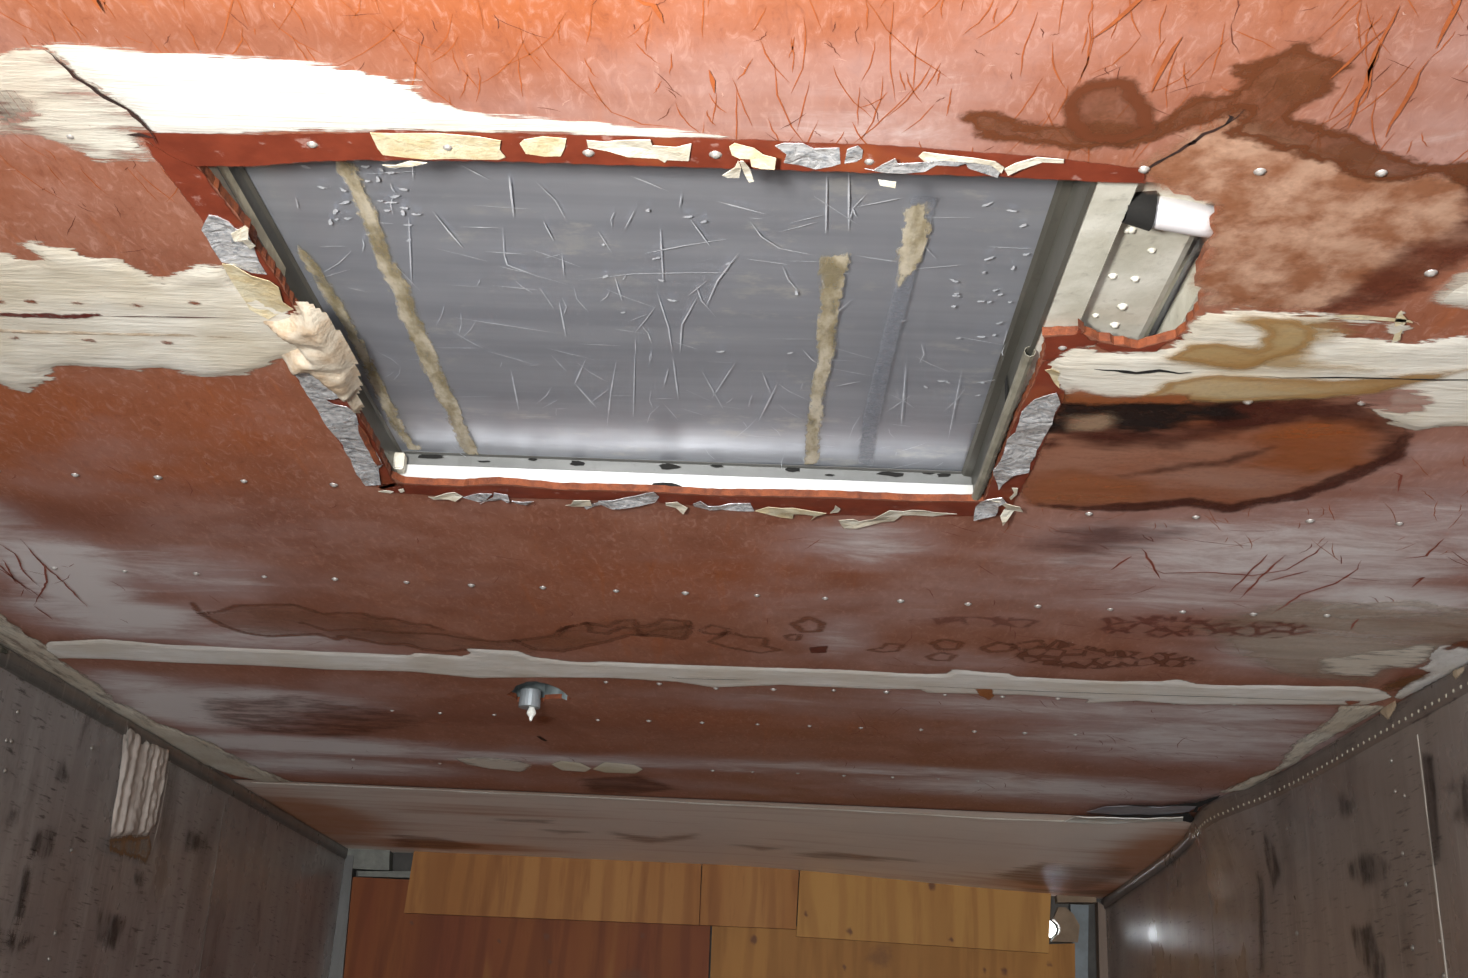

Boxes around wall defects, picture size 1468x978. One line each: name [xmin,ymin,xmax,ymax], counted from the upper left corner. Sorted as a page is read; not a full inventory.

peeling [0,45,146,162]
peeling [370,133,505,168]
peeling [520,136,566,157]
peeling [587,139,691,163]
peeling [722,143,1064,188]
water stain [961,43,1468,513]
peeling [429,492,534,505]
peeling [565,492,953,529]
water stain [191,603,828,653]
peeling [1321,645,1468,699]